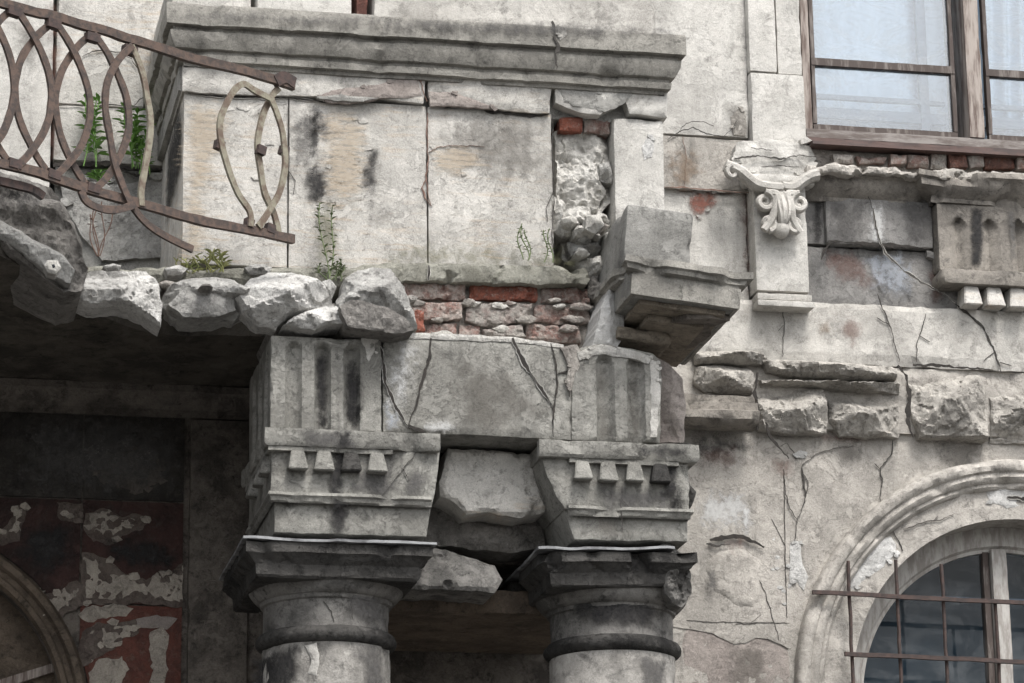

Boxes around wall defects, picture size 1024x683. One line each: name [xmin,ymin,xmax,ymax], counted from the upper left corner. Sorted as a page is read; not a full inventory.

crack [551,21,560,70]
water stain [364,151,378,184]
rust [671,156,717,219]
crack [664,121,816,193]
flaking render [0,105,662,437]
crack [380,338,432,494]
crack [511,337,568,437]
crack [821,196,1012,501]
peeling [0,502,31,546]
peeling [40,502,183,683]
crack [687,372,854,640]
peeling [850,536,900,590]